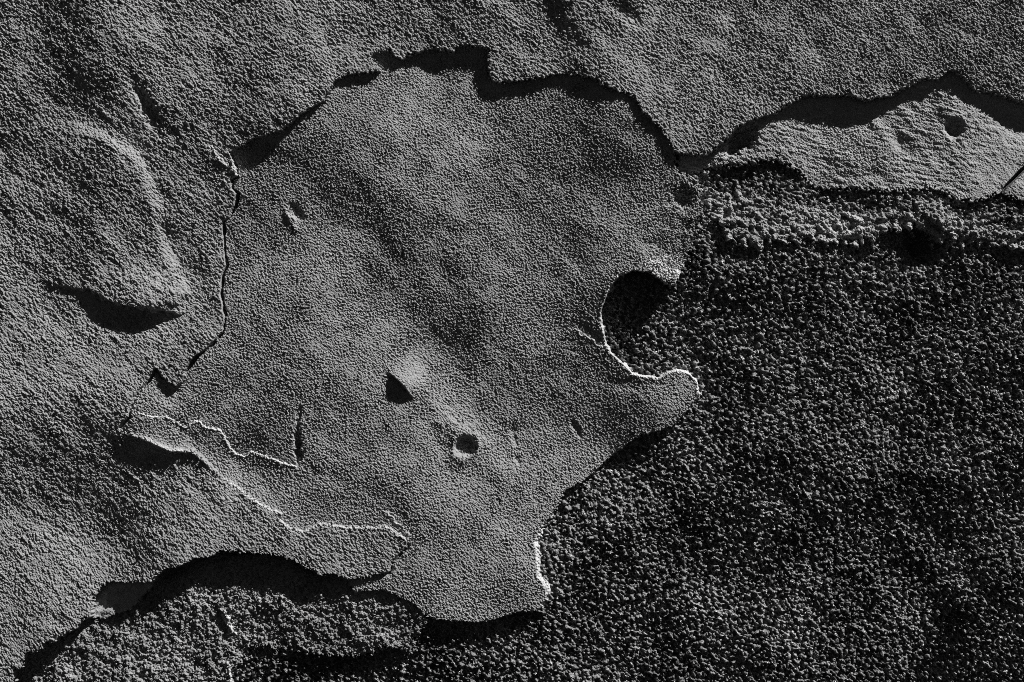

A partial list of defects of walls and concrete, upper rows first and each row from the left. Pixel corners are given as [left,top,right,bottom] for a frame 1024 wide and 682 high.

crack [207,144,243,178]
crack [1000,164,1024,195]
spalling [120,43,1024,625]
spalling [11,549,432,682]